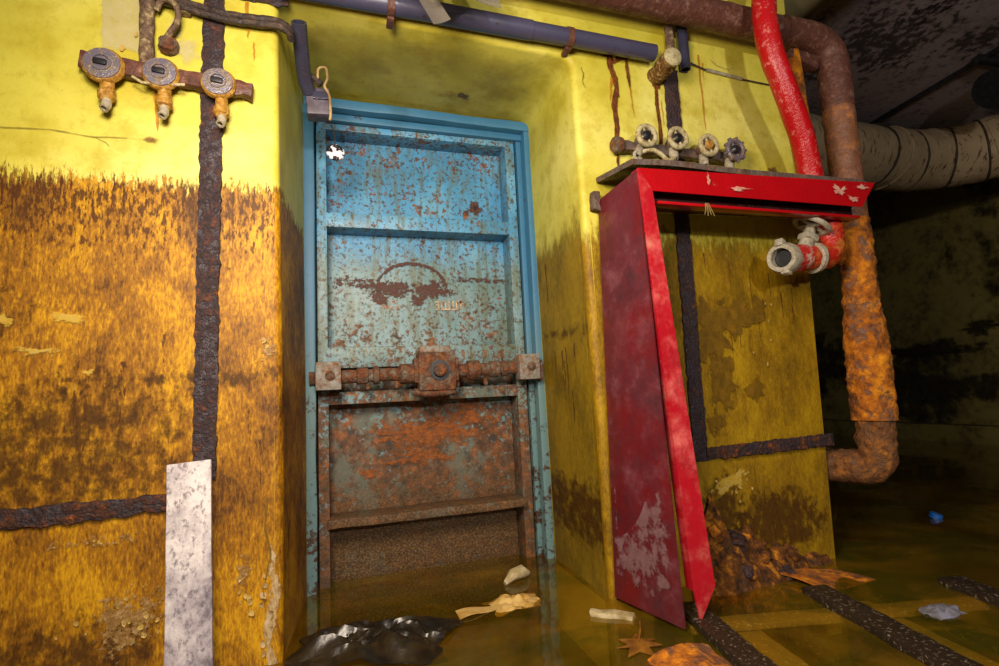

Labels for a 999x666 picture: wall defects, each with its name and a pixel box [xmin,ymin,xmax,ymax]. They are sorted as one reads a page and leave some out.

crack [0,126,143,146]
rust [603,54,635,137]
water stain [841,0,999,91]
water stain [0,162,199,509]
water stain [212,177,307,666]
water stain [691,235,847,565]
water stain [891,316,999,424]
peeling [710,468,754,503]
water stain [0,511,166,666]